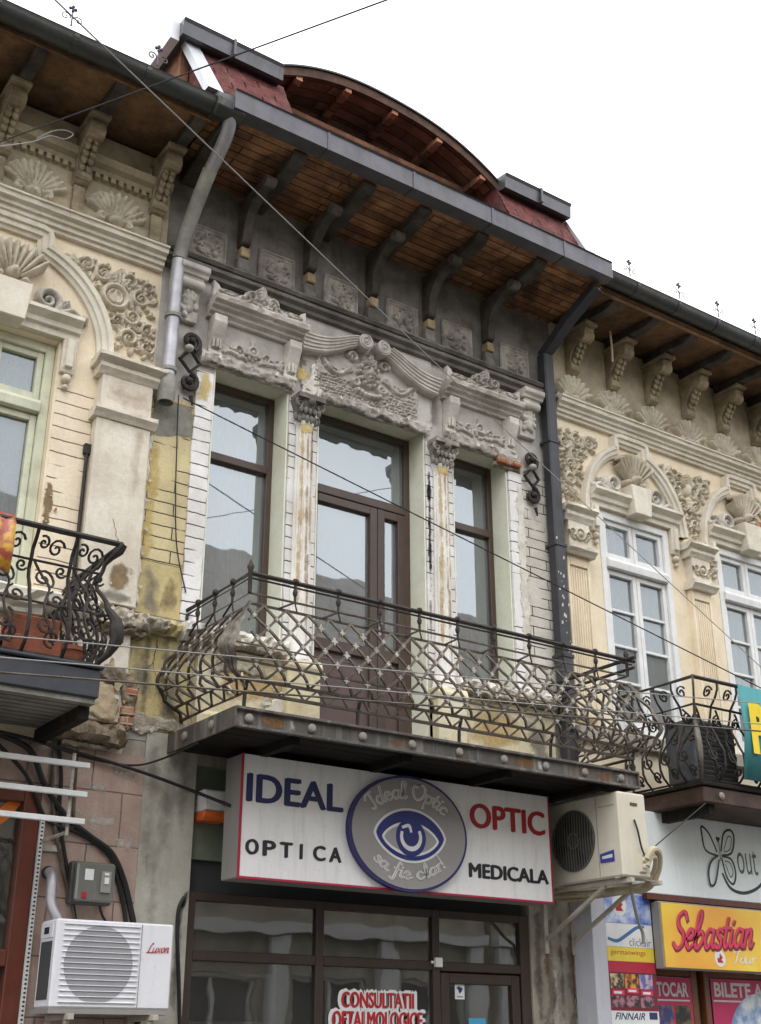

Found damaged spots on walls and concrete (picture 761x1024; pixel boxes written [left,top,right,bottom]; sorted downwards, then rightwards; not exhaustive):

spalling [50,658,190,752]